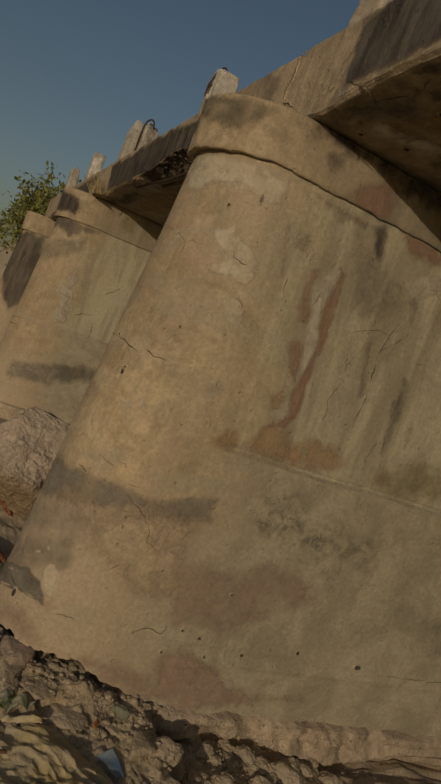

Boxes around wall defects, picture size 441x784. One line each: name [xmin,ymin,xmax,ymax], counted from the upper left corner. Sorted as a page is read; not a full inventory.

crack [283,50,308,107]
damp [347,0,441,81]
corrosion [273,275,342,427]
crack [320,275,440,431]